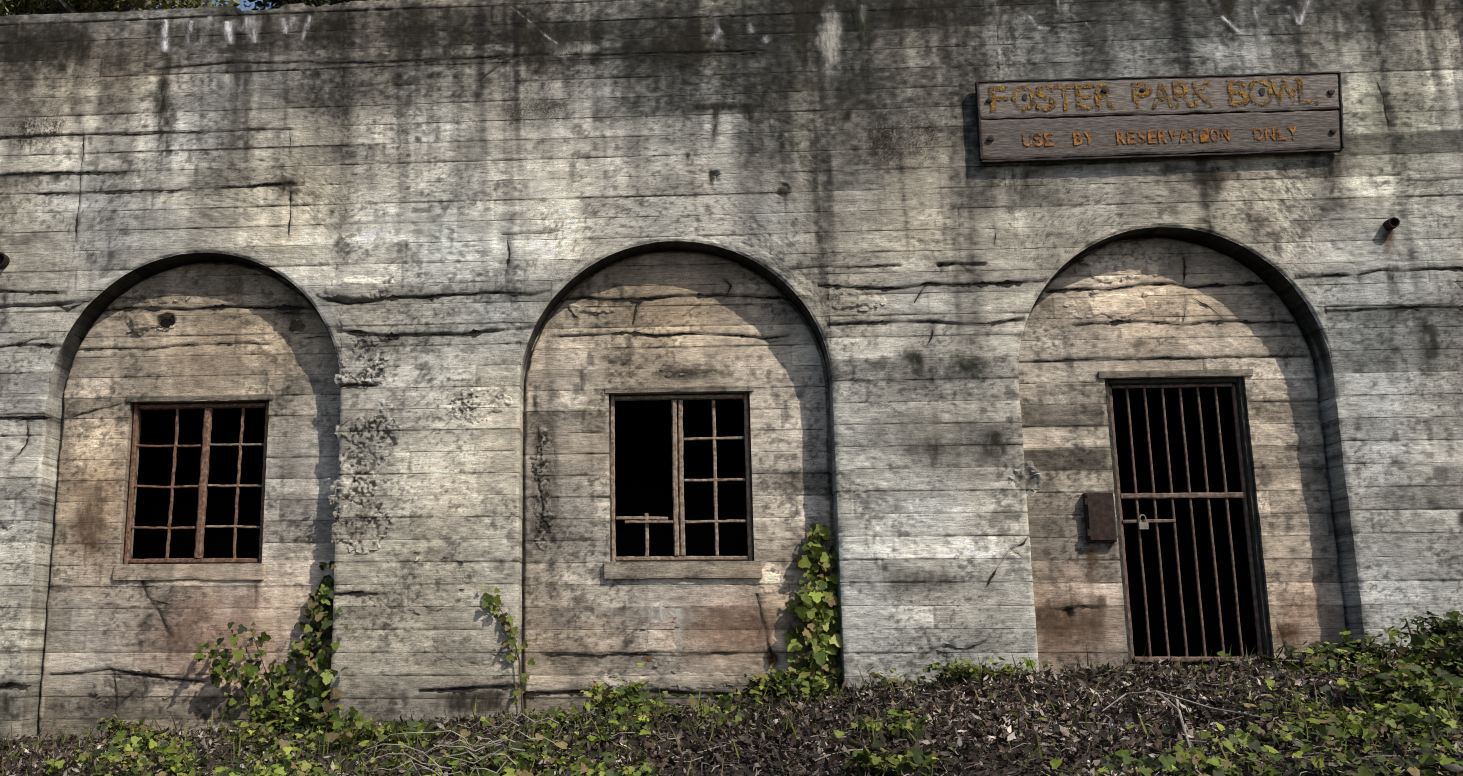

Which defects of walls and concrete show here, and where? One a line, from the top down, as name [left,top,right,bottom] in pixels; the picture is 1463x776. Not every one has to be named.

water stain [1210,0,1235,40]
water stain [1404,0,1446,60]
water stain [13,112,65,147]
water stain [157,51,180,137]
water stain [695,68,772,138]
water stain [3,171,61,180]
crack [0,129,291,236]
crack [986,537,1028,587]
crack [141,580,174,638]